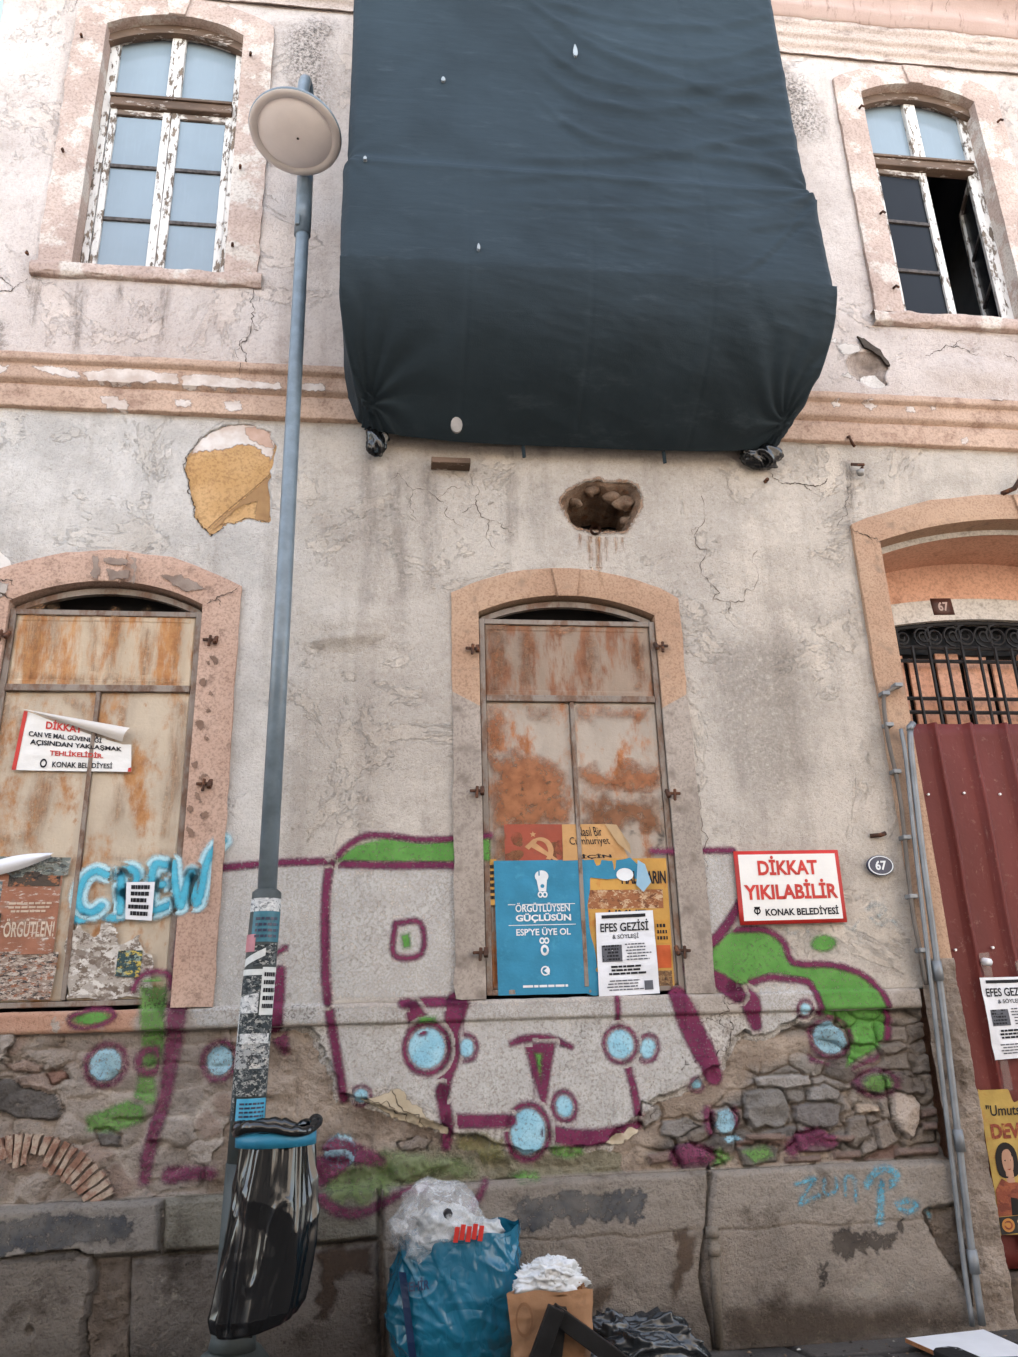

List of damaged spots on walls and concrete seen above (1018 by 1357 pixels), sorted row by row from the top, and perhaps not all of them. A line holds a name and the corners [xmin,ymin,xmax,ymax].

crack [235,289,258,374]
peeling [302,383,325,392]
peeling [34,366,282,537]
spalling [559,476,643,536]
crack [691,496,759,612]
corrosion [487,710,568,861]
corrosion [581,757,663,841]
spalling [0,1028,238,1204]
spalling [265,1004,947,1190]